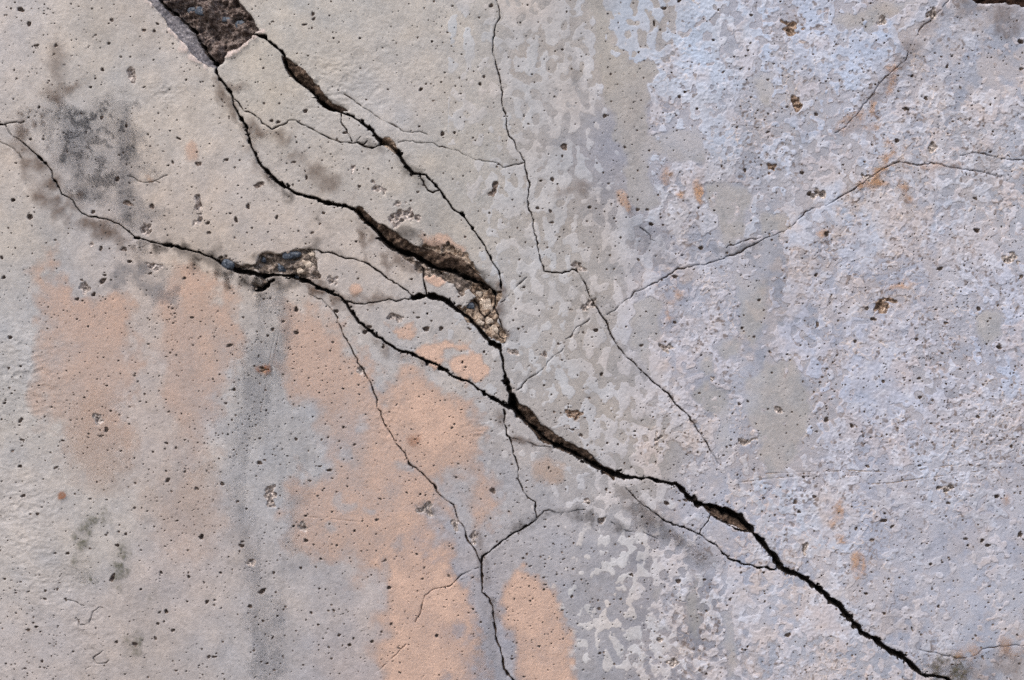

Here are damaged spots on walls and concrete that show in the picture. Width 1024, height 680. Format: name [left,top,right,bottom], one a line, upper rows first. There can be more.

spalling [150,0,265,69]
crack [20,141,222,266]
hole [388,201,421,228]
crack [837,153,985,199]
spalling [218,248,338,290]
crack [215,0,951,680]
peeling [400,0,1024,680]